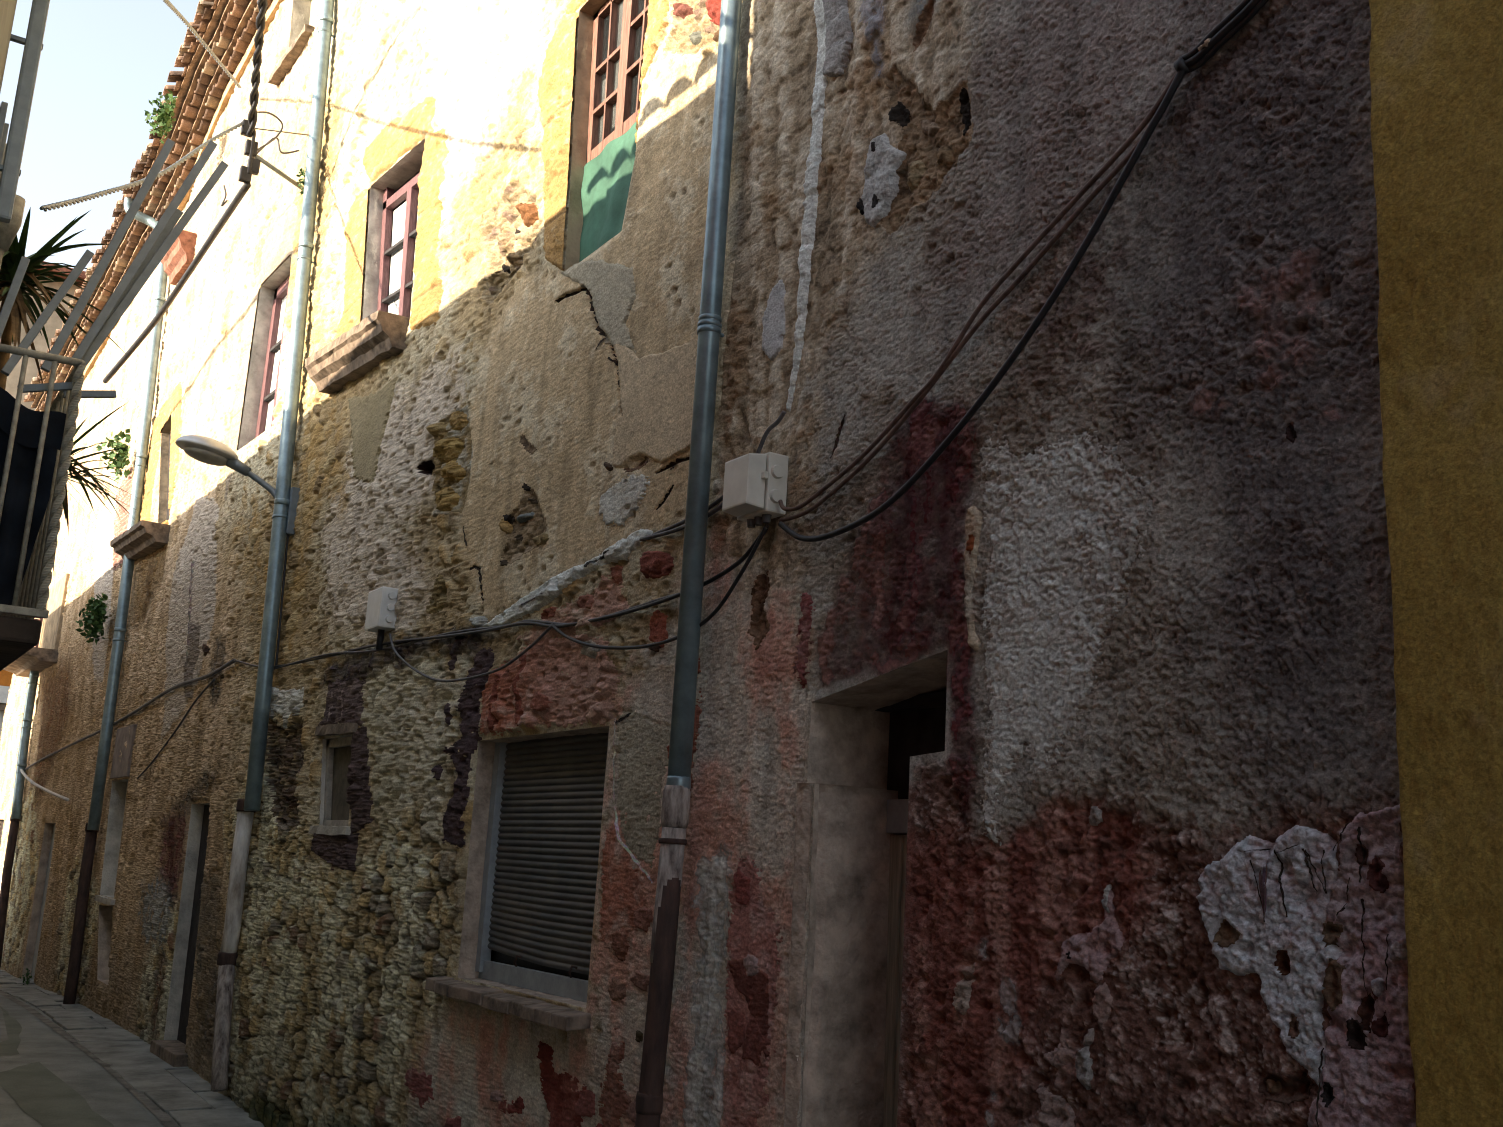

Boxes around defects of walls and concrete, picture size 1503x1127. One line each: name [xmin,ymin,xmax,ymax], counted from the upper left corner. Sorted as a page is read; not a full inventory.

flaking render [913,0,936,52]
flaking render [856,63,974,235]
flaking render [479,181,541,307]
crack [555,288,620,390]
flaking render [426,405,473,517]
flaking render [499,483,549,566]
peeling [480,551,686,1001]
peeling [690,658,702,798]
peeling [1196,804,1416,1127]